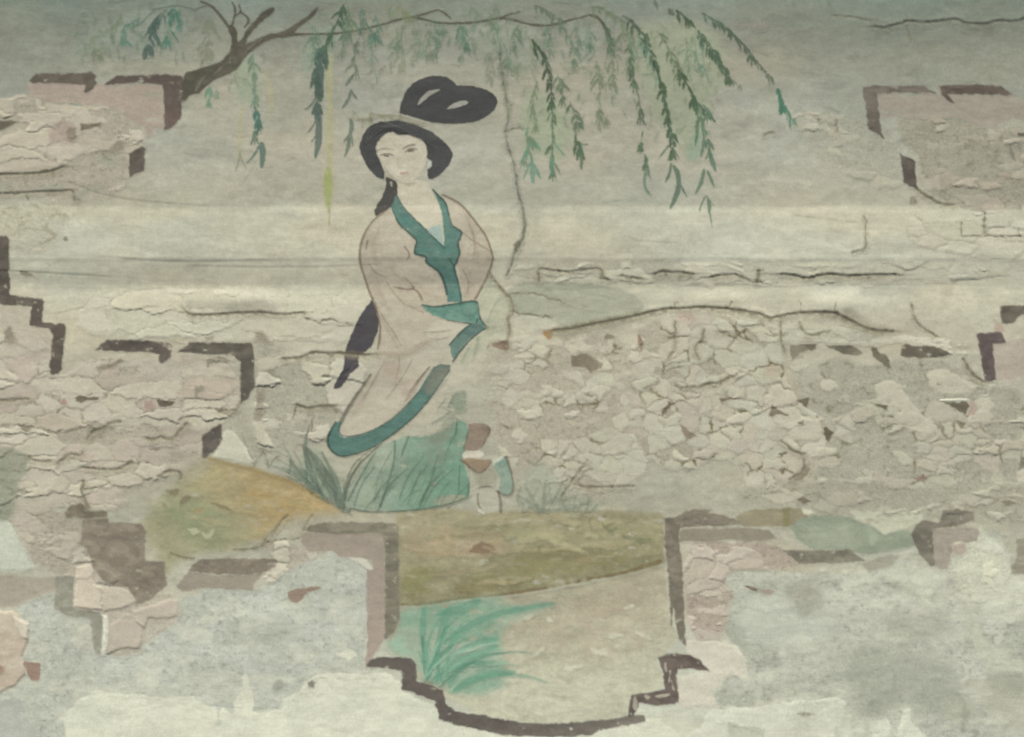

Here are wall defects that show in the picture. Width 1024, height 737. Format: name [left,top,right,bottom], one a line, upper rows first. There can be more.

crack [832,13,1024,44]
peeling [0,92,147,278]
crack [486,52,940,395]
peeling [513,108,1024,289]
peeling [75,286,369,452]
crack [960,356,990,389]
peeling [0,324,506,737]
crack [559,457,637,504]
crack [776,438,812,486]
water stain [779,577,828,620]
water stain [828,603,1024,733]